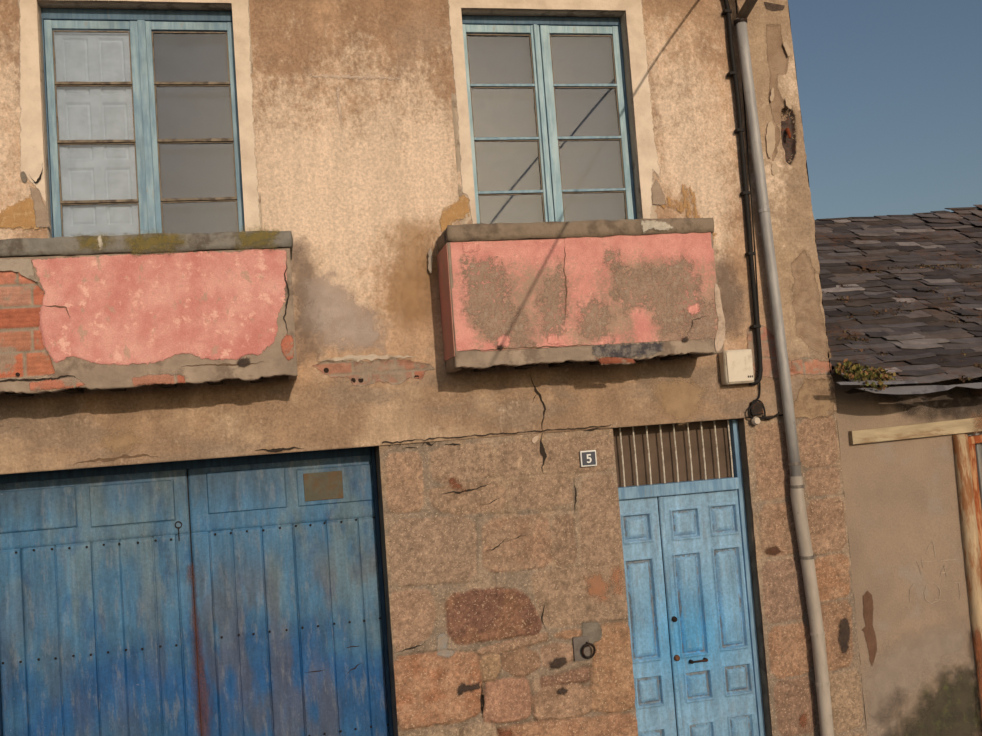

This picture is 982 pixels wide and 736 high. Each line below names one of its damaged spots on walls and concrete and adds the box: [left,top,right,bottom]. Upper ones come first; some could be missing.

spalling [764,2,785,11]
flaking render [765,24,796,176]
peeling [0,195,40,231]
peeling [661,184,703,218]
peeling [460,250,718,351]
flaking render [0,258,84,391]
flaking render [132,374,185,386]
flaking render [313,354,435,387]
flaking render [599,357,635,365]
crack [382,375,612,471]
damp [863,632,982,736]